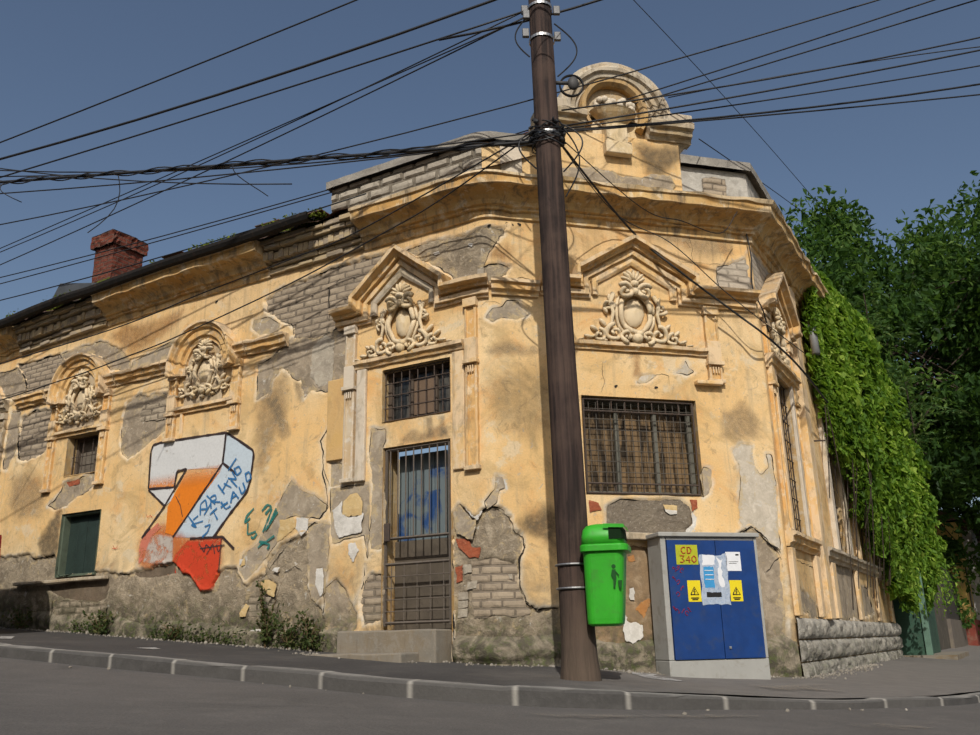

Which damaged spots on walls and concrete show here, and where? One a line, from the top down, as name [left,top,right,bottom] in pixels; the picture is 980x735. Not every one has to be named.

peeling [406,226,509,282]
peeling [486,300,528,322]
peeling [716,252,771,300]
peeling [256,328,346,400]
peeling [121,393,167,459]
spalling [0,428,387,631]
spalling [452,475,561,639]
peeling [589,467,712,533]
peeling [732,443,786,640]
spalling [595,545,654,644]